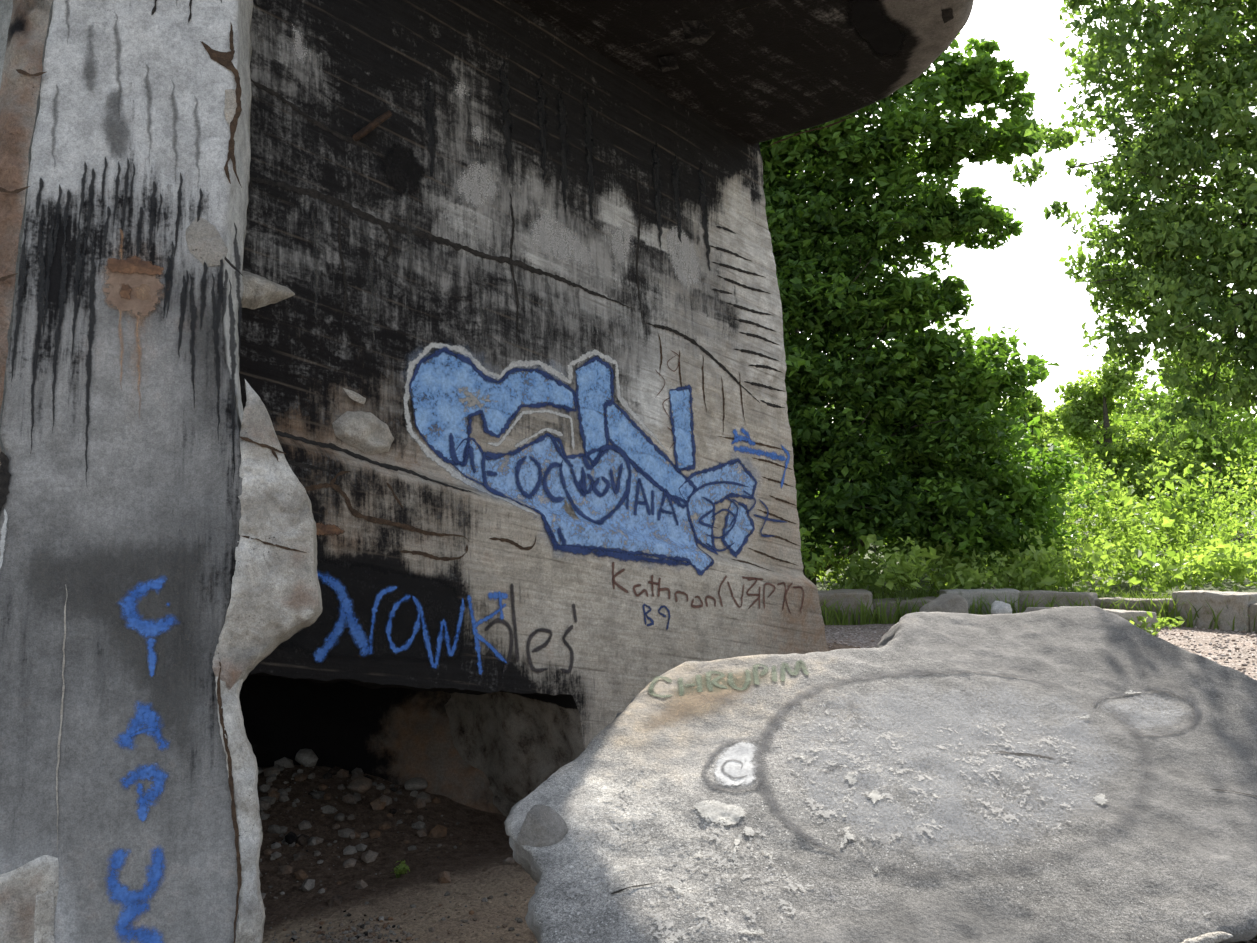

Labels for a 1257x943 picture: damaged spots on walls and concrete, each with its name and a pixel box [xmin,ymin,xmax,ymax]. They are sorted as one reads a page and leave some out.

water stain [292,24,311,63]
water stain [11,25,242,485]
rust [103,229,164,415]
water stain [423,73,438,177]
water stain [454,162,496,208]
crack [188,0,799,572]
water stain [530,74,596,269]
water stain [611,225,634,266]
water stain [652,142,711,289]